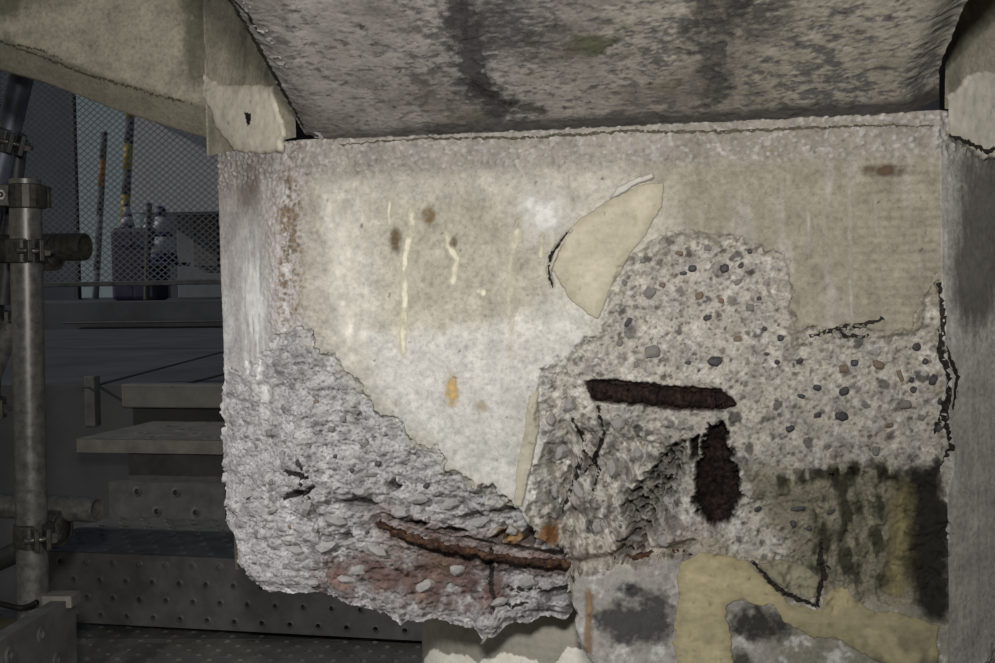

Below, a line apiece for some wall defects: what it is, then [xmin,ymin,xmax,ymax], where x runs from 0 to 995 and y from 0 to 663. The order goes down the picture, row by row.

leakage [426,0,939,136]
spalling [219,173,954,644]
crack [933,282,960,473]
corrosion [326,544,506,607]
corrosion [504,529,526,543]
corrosion [538,522,558,545]